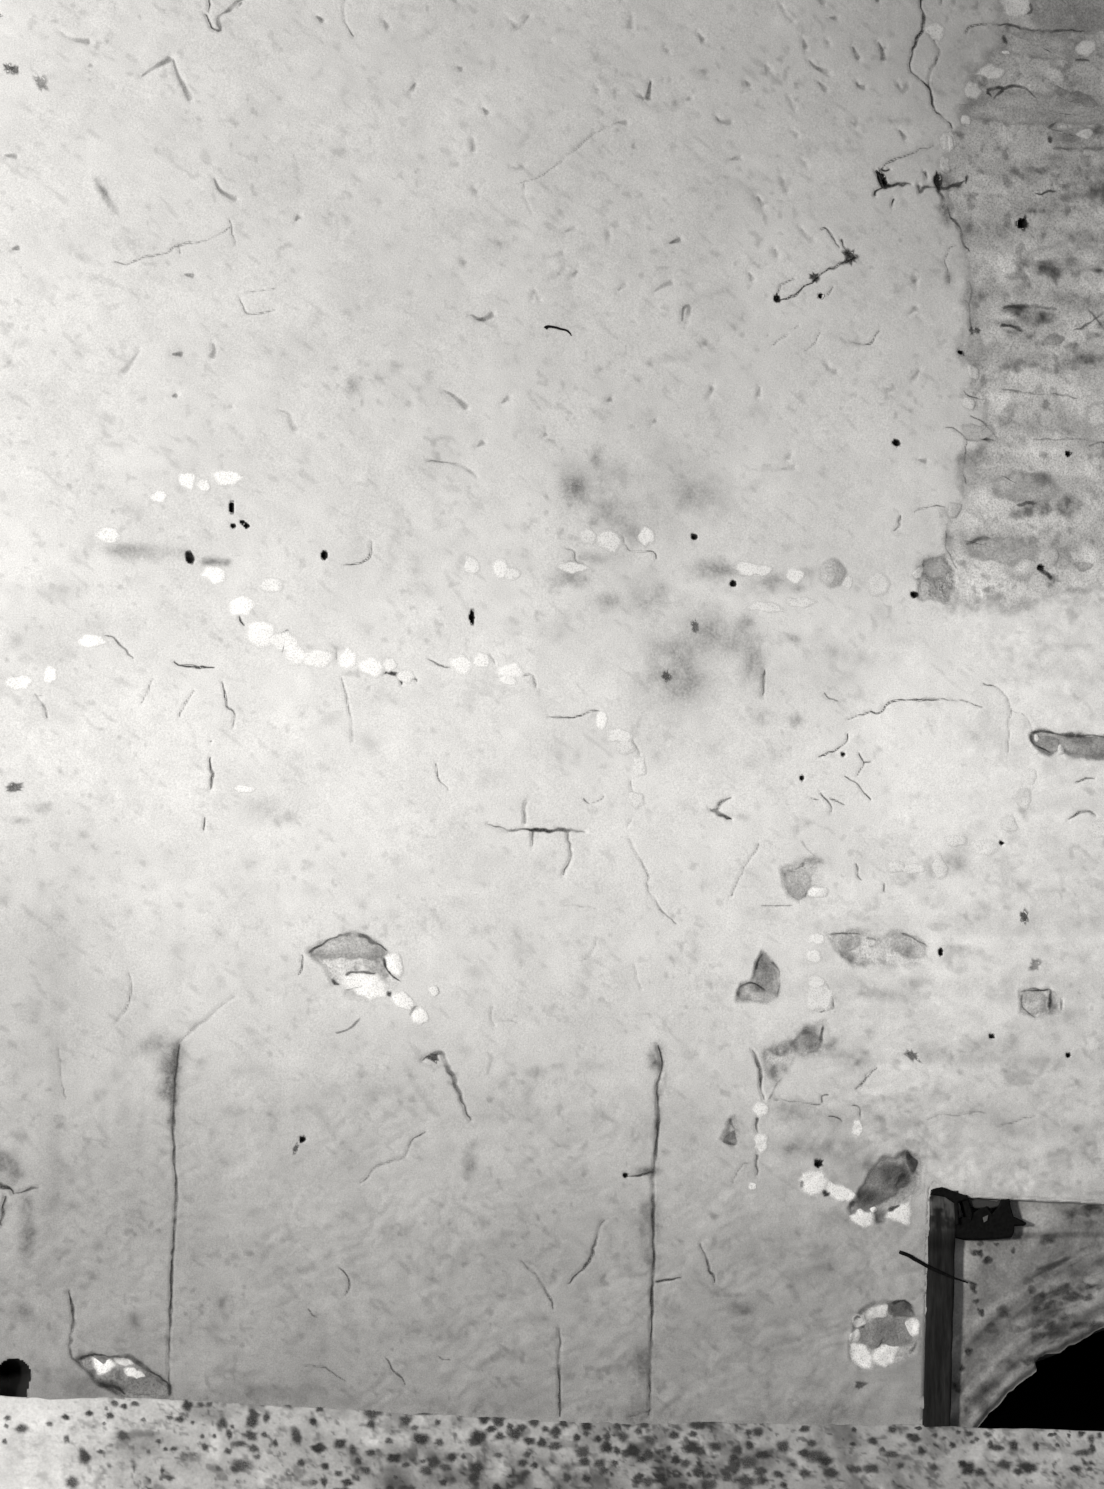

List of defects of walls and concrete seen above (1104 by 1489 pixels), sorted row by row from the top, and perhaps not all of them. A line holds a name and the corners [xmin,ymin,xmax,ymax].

crack [909,0,952,128]
crack [775,227,847,301]
crack [814,685,991,804]
flaking render [1029,729,1104,760]
crack [493,826,569,870]
flaking render [306,931,439,1025]
flaking render [737,951,779,1003]
crack [168,1046,179,1391]
crack [631,1046,715,1341]
flaking render [799,1151,922,1228]
flaking render [75,1353,170,1399]
flaking render [849,1300,921,1388]